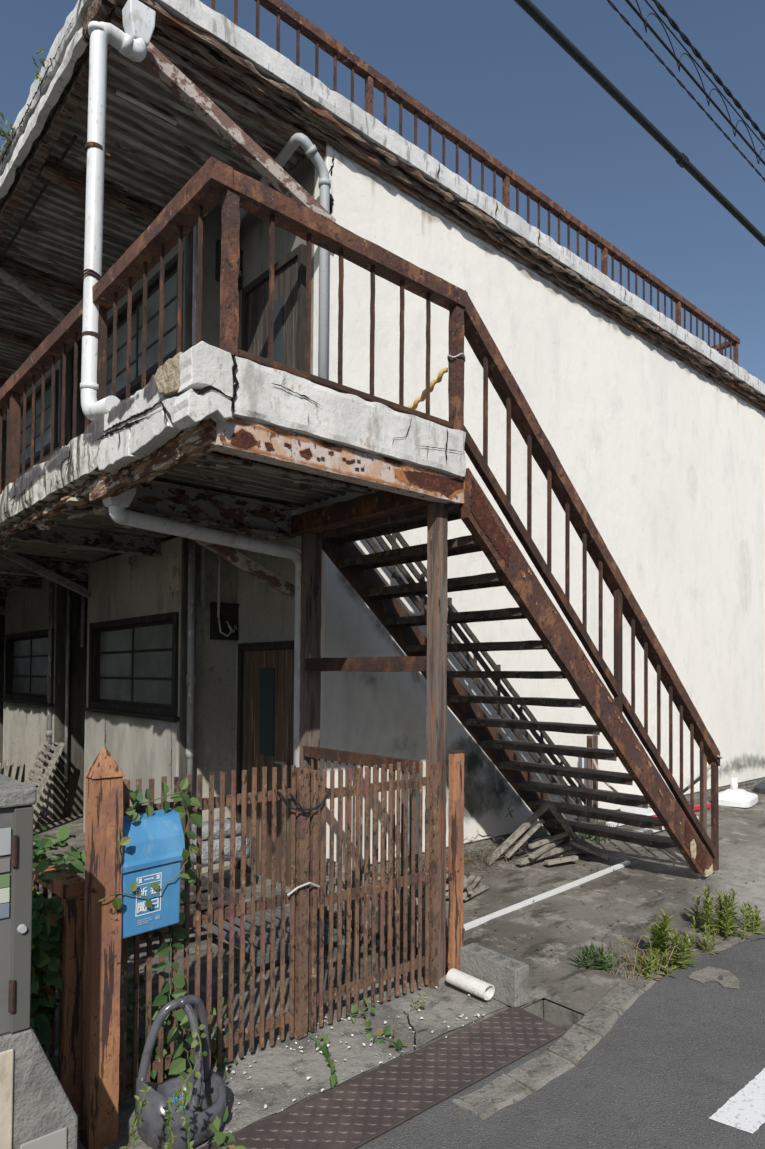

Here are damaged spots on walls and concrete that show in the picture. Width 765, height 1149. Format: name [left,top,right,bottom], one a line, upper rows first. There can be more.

crack [193,354,239,414]
crack [272,379,323,423]
crack [60,401,166,478]
peeling [299,441,342,459]
peeling [383,457,465,500]
spalling [0,493,146,550]
leakage [459,741,509,816]